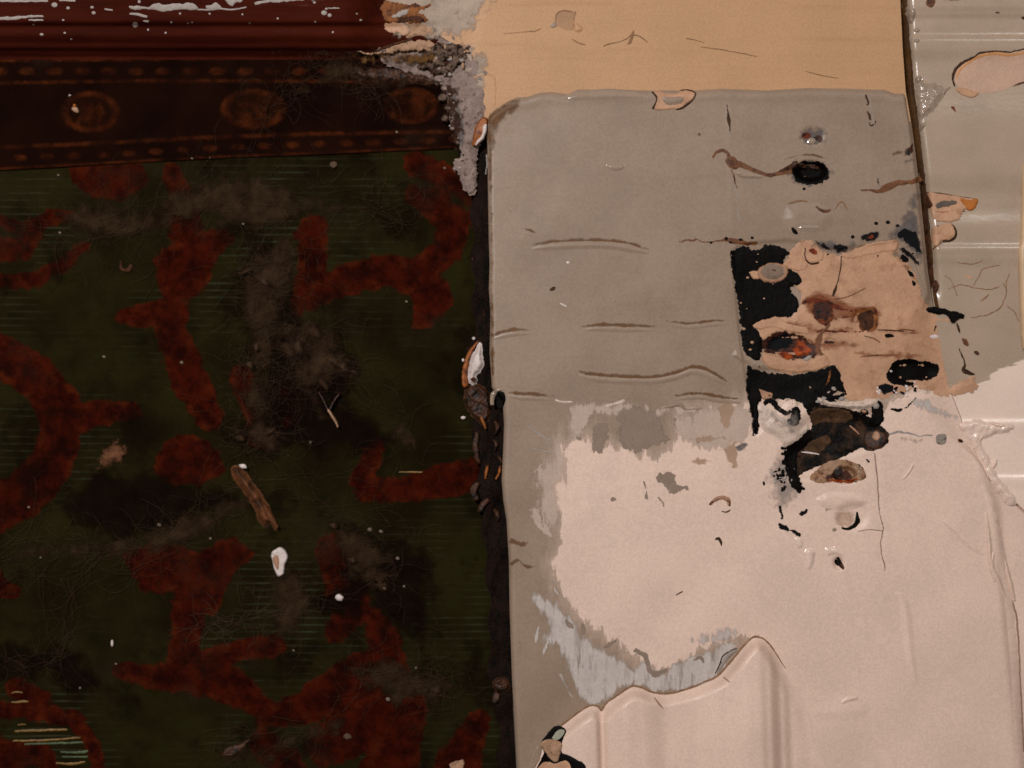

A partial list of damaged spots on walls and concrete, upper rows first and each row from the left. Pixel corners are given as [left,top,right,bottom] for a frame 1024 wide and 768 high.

leakage [387,0,484,39]
peeling [952,48,1024,98]
peeling [651,89,696,110]
crack [712,104,792,189]
peeling [927,192,978,250]
rust [762,295,878,361]
peeling [732,239,979,401]
peeling [576,406,676,454]
peeling [643,472,689,507]
peeling [709,495,731,513]